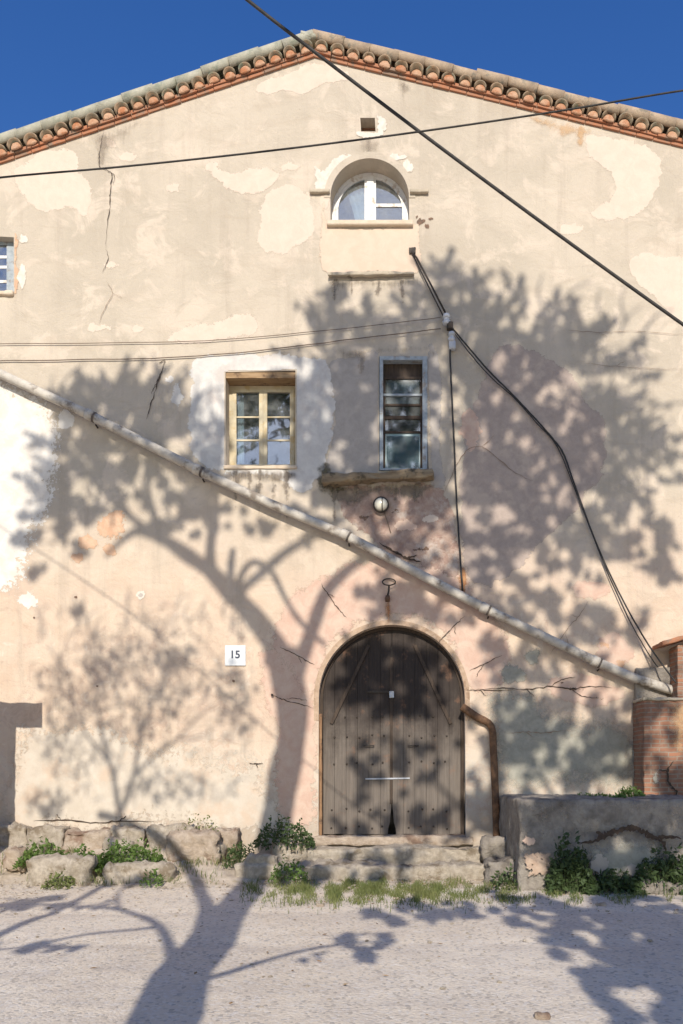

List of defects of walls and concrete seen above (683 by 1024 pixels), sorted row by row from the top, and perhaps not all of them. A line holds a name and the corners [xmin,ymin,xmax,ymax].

crack [98,135,120,320]
crack [147,359,165,416]
flaking render [0,382,75,619]
flaking render [0,483,512,835]
crack [469,656,610,698]